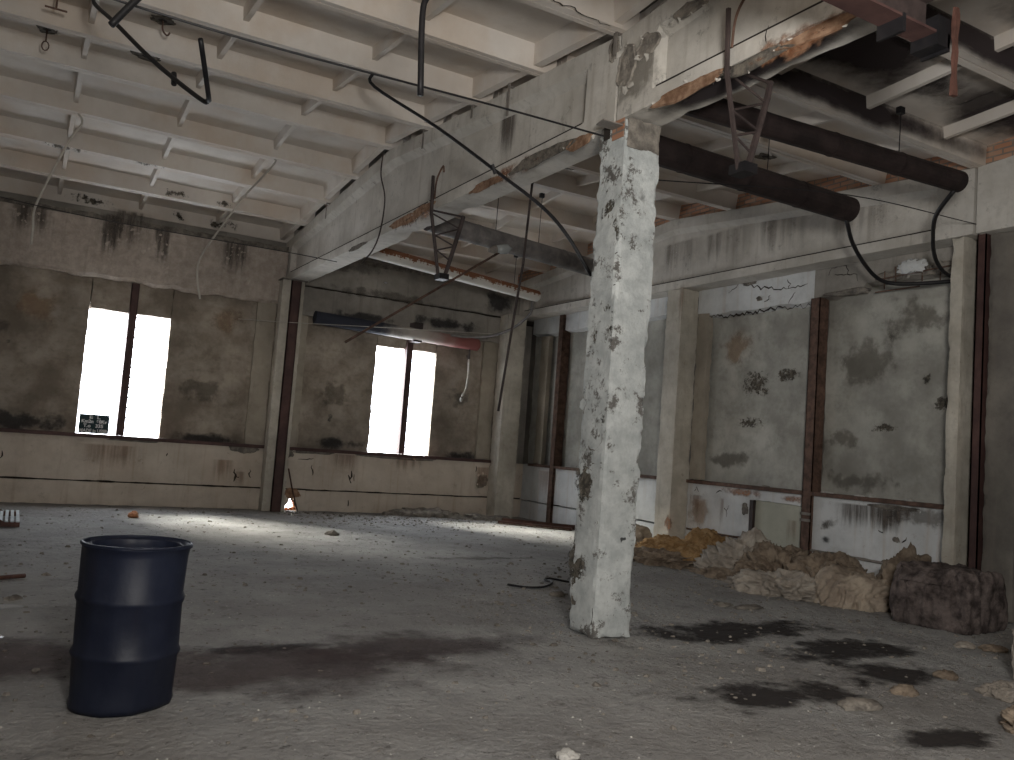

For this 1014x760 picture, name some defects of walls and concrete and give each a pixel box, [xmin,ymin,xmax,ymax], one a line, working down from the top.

peeling [669,0,709,24]
peeling [608,32,662,95]
spalling [650,12,857,109]
water stain [102,210,143,245]
spalling [822,259,952,297]
crack [710,279,810,318]
spalling [743,369,797,394]
water stain [0,410,64,431]
water stain [845,504,910,526]
peeling [567,539,586,605]